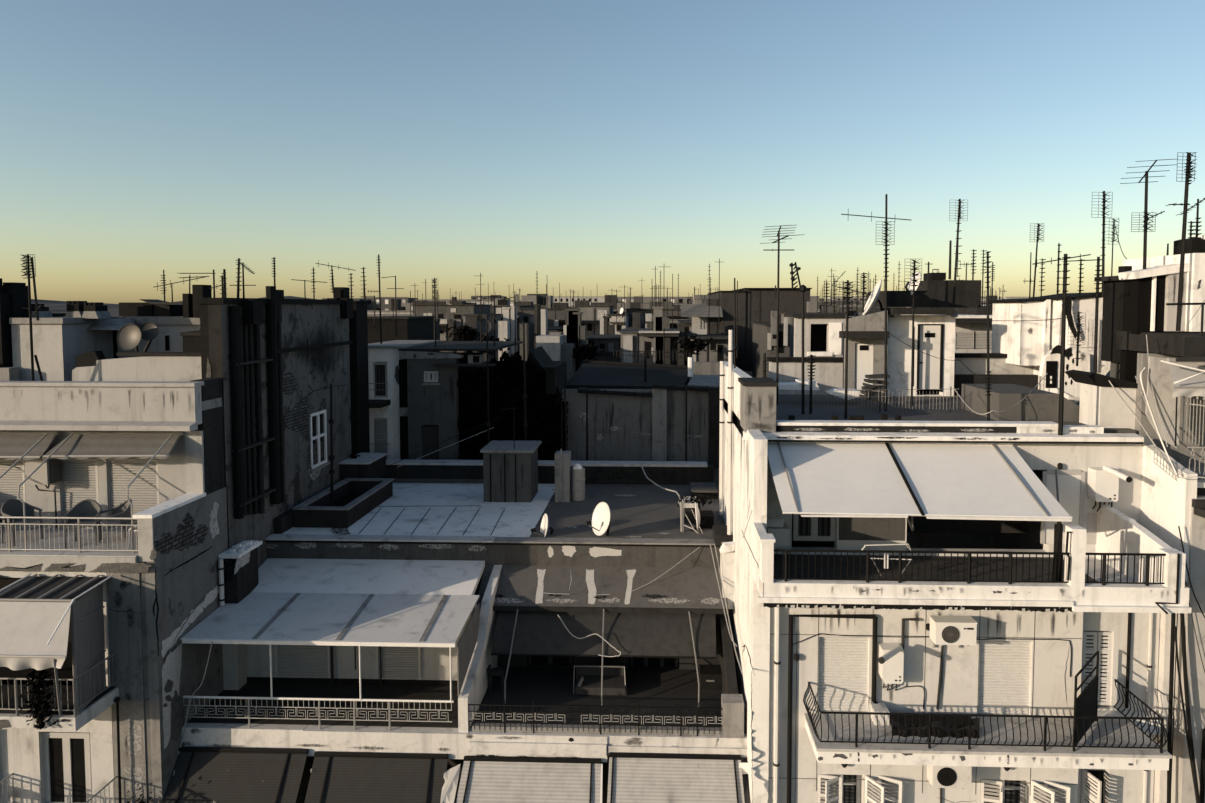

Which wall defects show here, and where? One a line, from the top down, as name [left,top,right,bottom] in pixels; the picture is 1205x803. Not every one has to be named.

spalling [0,358,225,573]